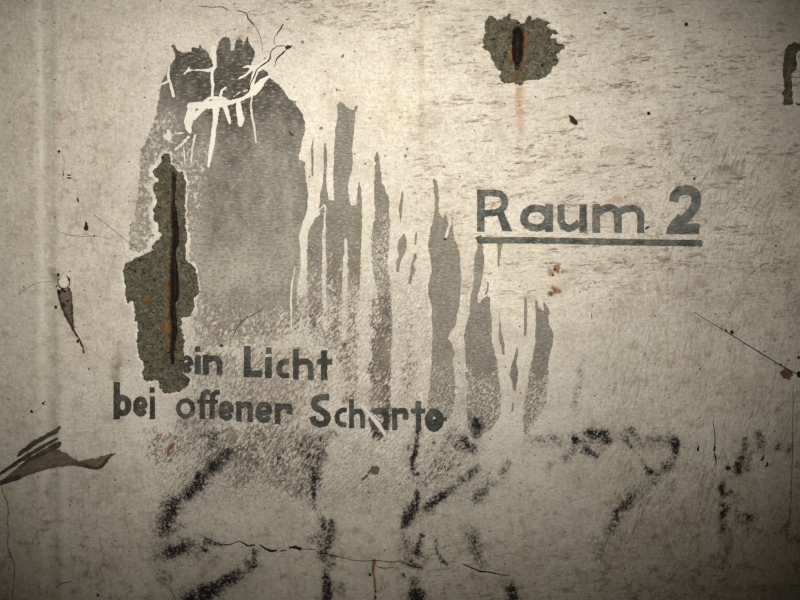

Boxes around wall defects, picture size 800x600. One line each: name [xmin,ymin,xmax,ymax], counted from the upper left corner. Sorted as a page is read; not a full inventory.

spalling [482,14,565,86]
spalling [123,153,419,513]
peeling [401,443,466,487]
crack [203,537,421,568]